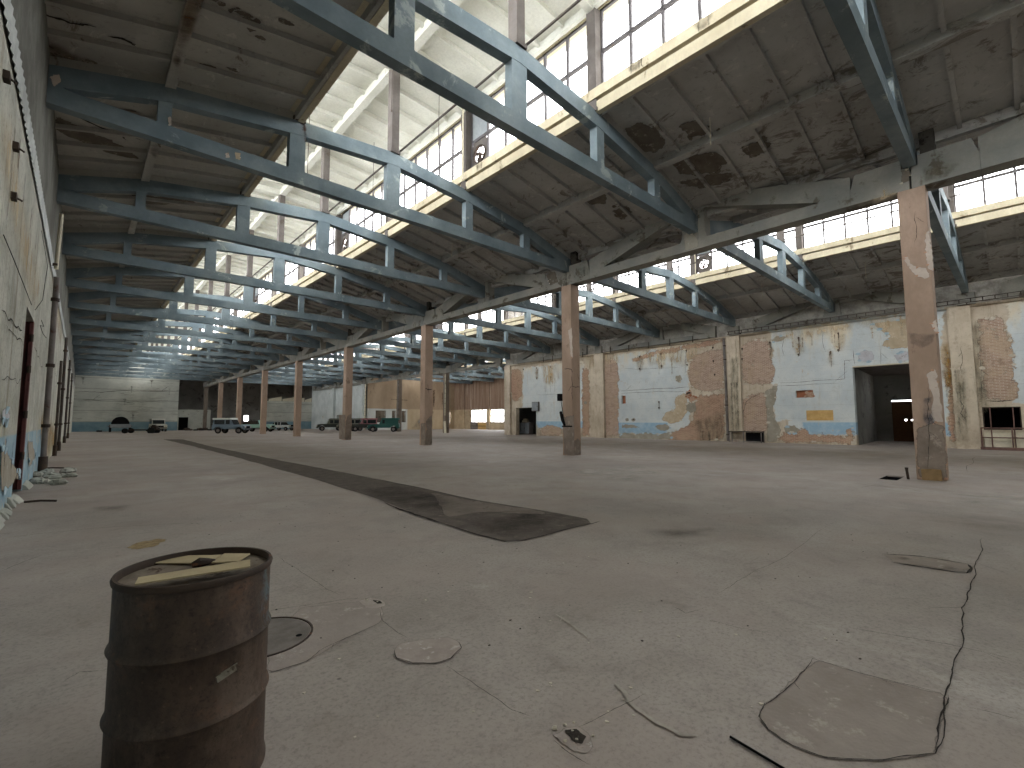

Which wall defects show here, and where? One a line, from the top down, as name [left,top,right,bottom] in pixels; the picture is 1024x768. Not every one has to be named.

peeling [625,123,665,153]
peeling [679,121,720,140]
peeling [673,152,732,189]
peeling [740,136,771,158]
peeling [903,231,934,279]
flaking render [976,317,1020,402]
flaking render [605,339,726,441]
crack [758,538,1018,760]